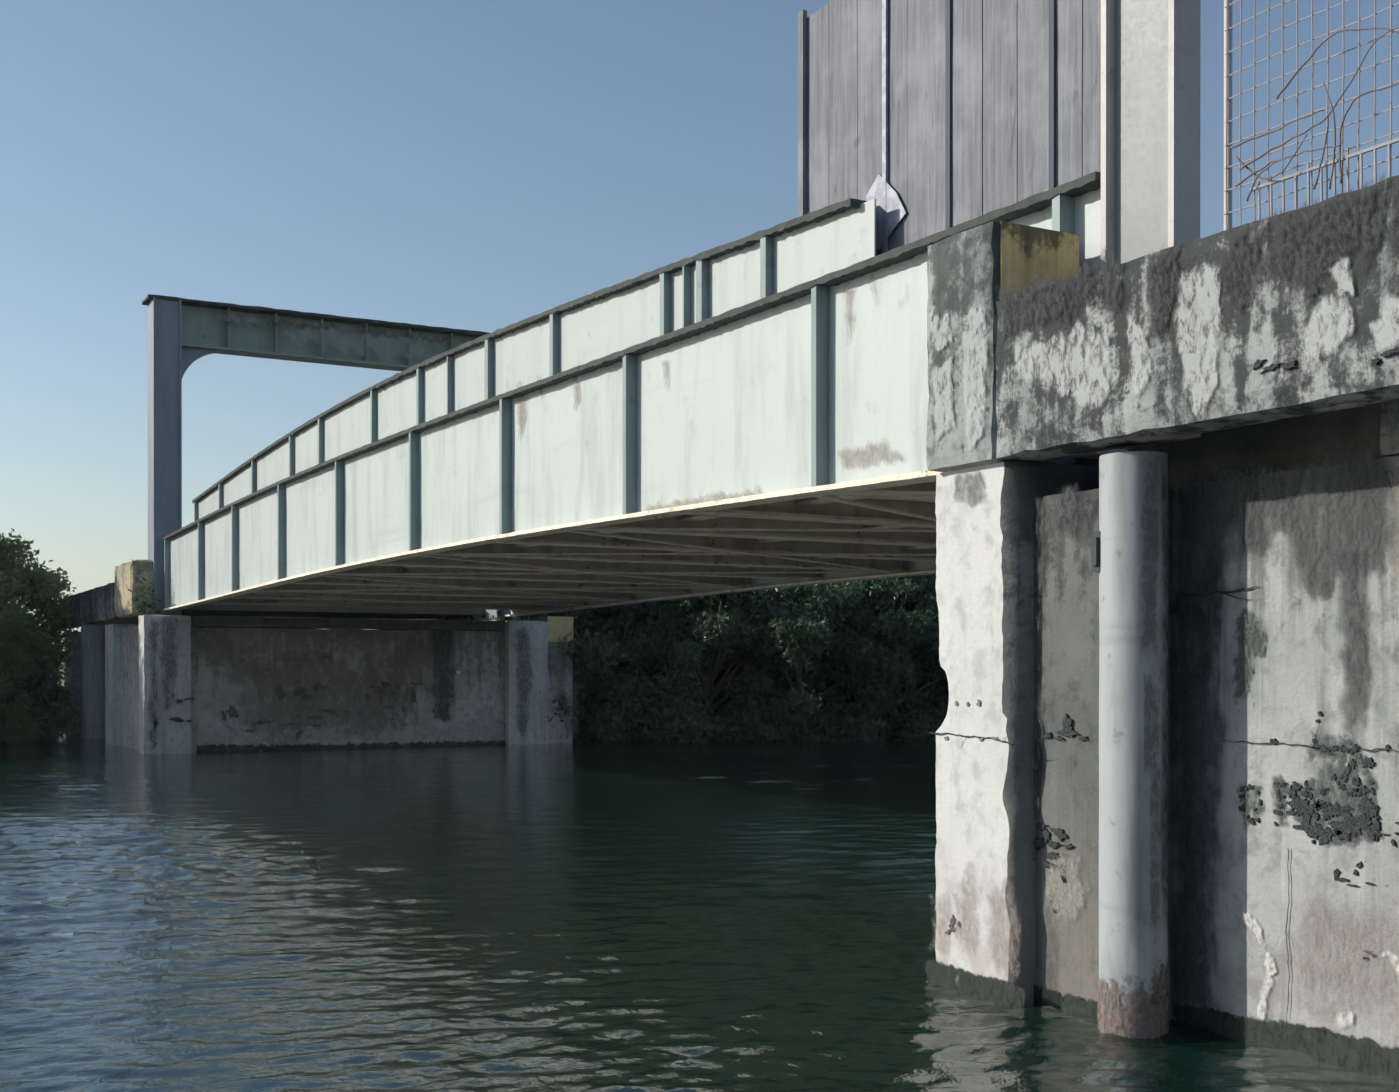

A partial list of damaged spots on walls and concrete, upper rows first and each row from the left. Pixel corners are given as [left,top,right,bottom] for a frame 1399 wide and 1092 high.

water stain [929,176,1399,449]
water stain [149,618,177,748]
water stain [420,628,532,743]
crack [929,732,1017,748]
water stain [1170,442,1390,1019]
crack [1219,724,1399,753]
peeling [1238,711,1399,847]
spalling [1033,823,1074,912]
peeling [1334,861,1375,887]
rust [1097,959,1170,1039]
efflorescence [1337,1011,1353,1027]